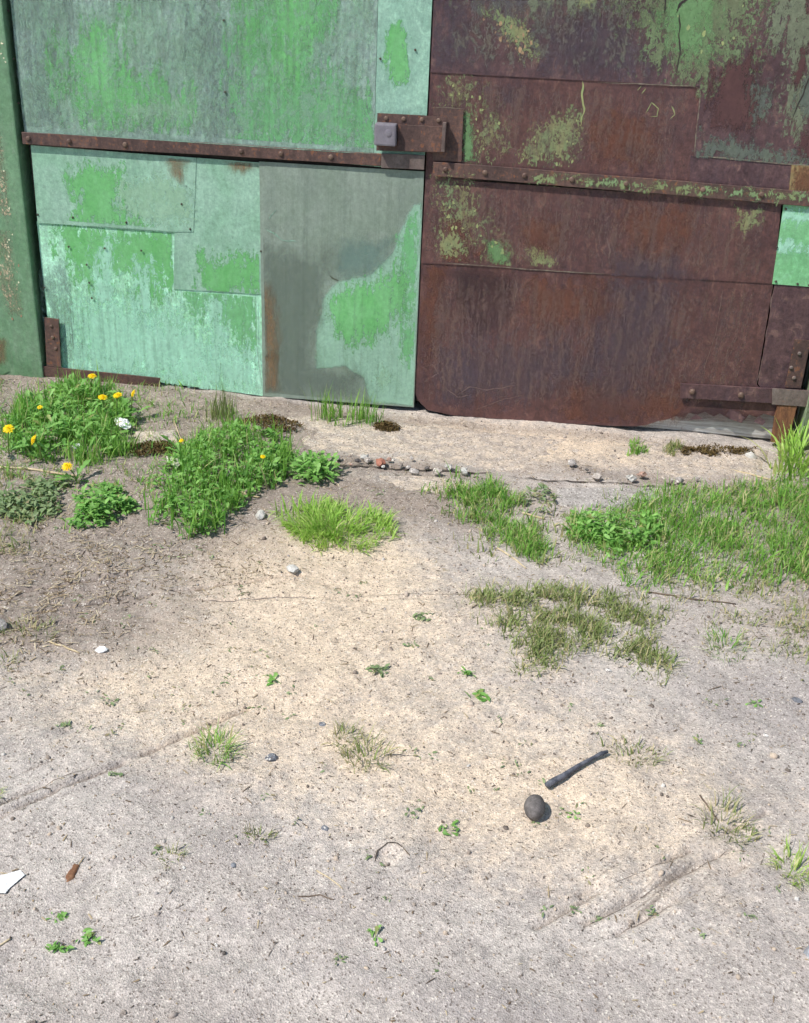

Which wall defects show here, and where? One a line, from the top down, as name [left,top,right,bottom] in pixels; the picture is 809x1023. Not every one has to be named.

crack [664,0,687,74]
rust [791,45,808,87]
peeling [316,0,809,406]